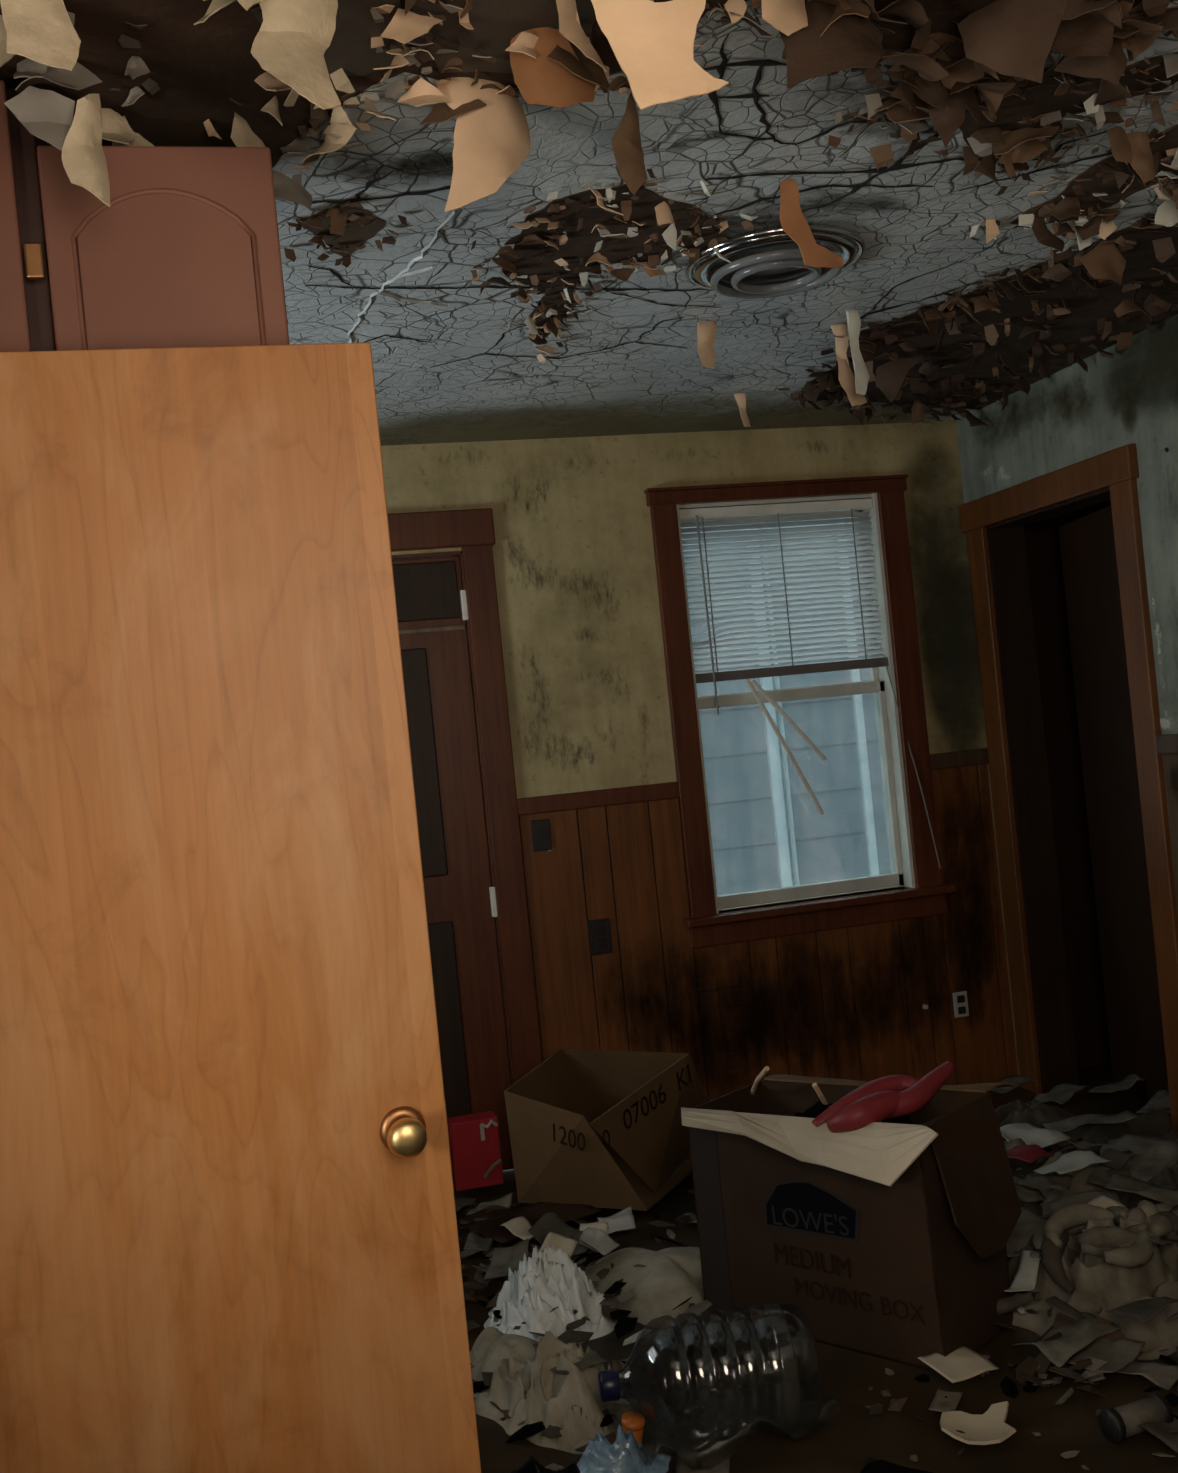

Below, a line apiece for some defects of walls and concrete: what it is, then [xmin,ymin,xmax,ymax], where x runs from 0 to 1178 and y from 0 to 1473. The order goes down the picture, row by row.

crack [294,170,722,368]
peeling [0,0,1178,428]
crack [821,260,971,334]
crack [703,33,1112,216]